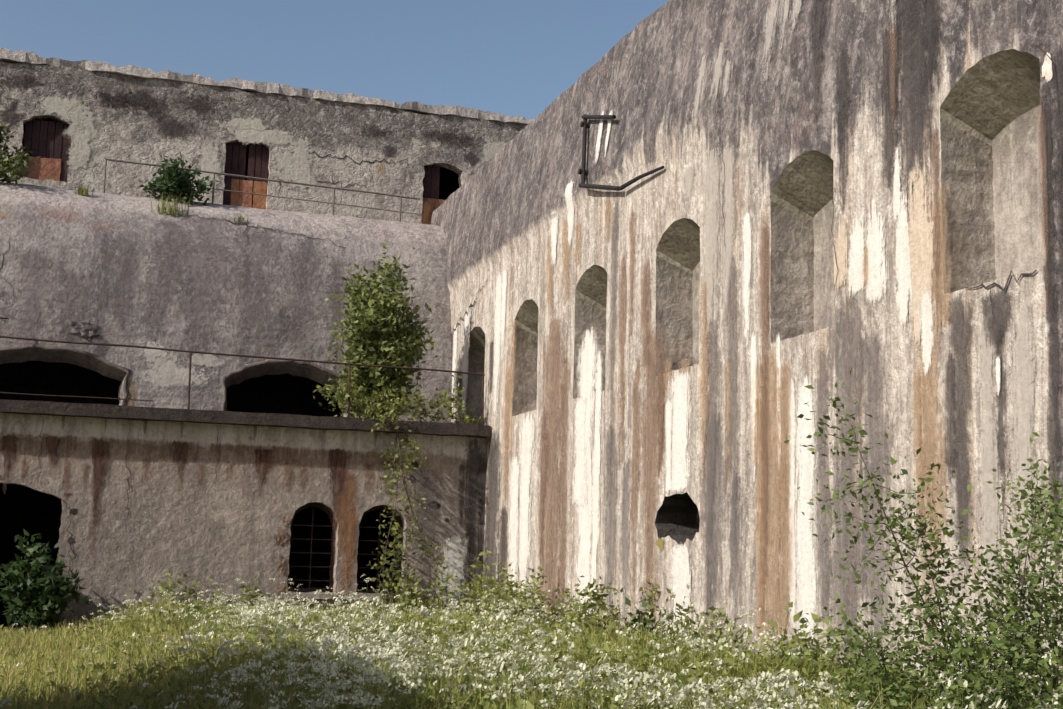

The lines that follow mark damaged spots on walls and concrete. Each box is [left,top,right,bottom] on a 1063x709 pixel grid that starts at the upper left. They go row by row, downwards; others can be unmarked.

efflorescence [762,0,801,80]
water stain [692,42,733,123]
crack [170,214,346,248]
crack [965,269,1037,313]
rust [2,434,18,477]
rust [45,436,60,465]
rust [92,438,109,523]
crack [125,426,133,533]
rust [172,440,189,479]
rust [254,449,272,482]
crack [60,498,76,580]